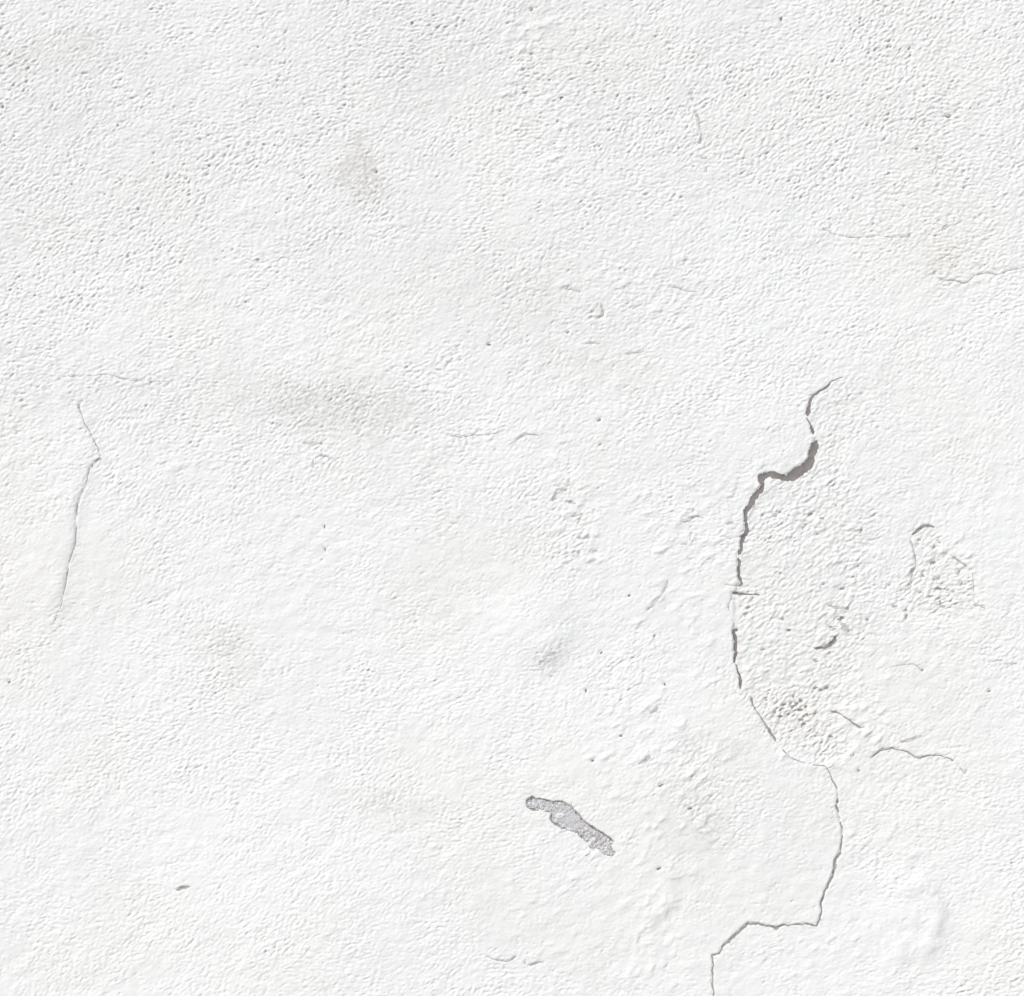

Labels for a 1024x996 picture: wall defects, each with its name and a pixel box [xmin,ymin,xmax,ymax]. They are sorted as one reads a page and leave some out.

crack [54,402,101,620]
crack [681,377,843,996]
spalling [526,795,616,856]